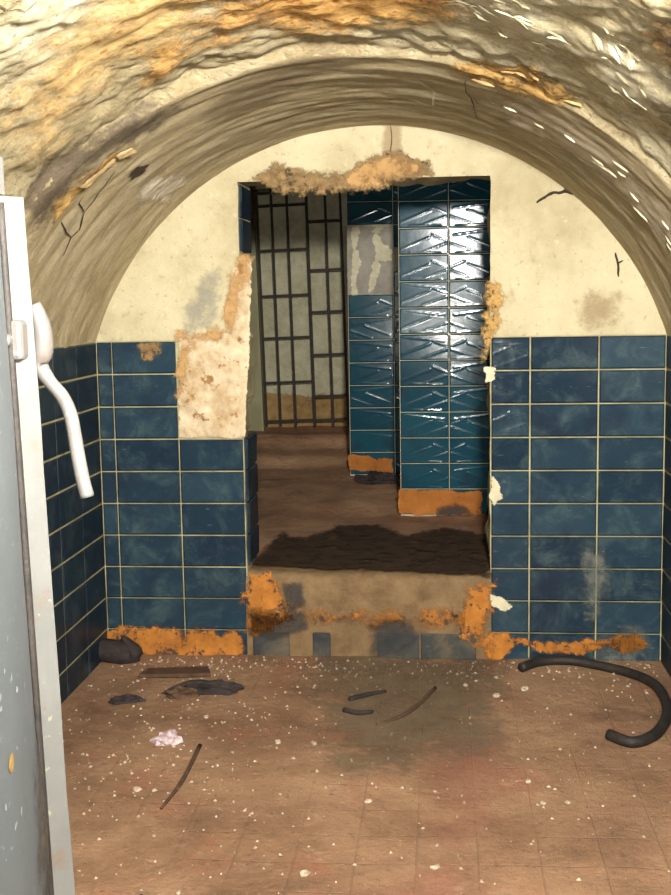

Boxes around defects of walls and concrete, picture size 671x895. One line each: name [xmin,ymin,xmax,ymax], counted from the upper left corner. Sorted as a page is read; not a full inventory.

spalling [638,15,671,64]
spalling [450,57,582,107]
spalling [252,150,435,197]
crack [536,188,573,203]
spalling [174,255,252,439]
spalling [482,281,504,383]